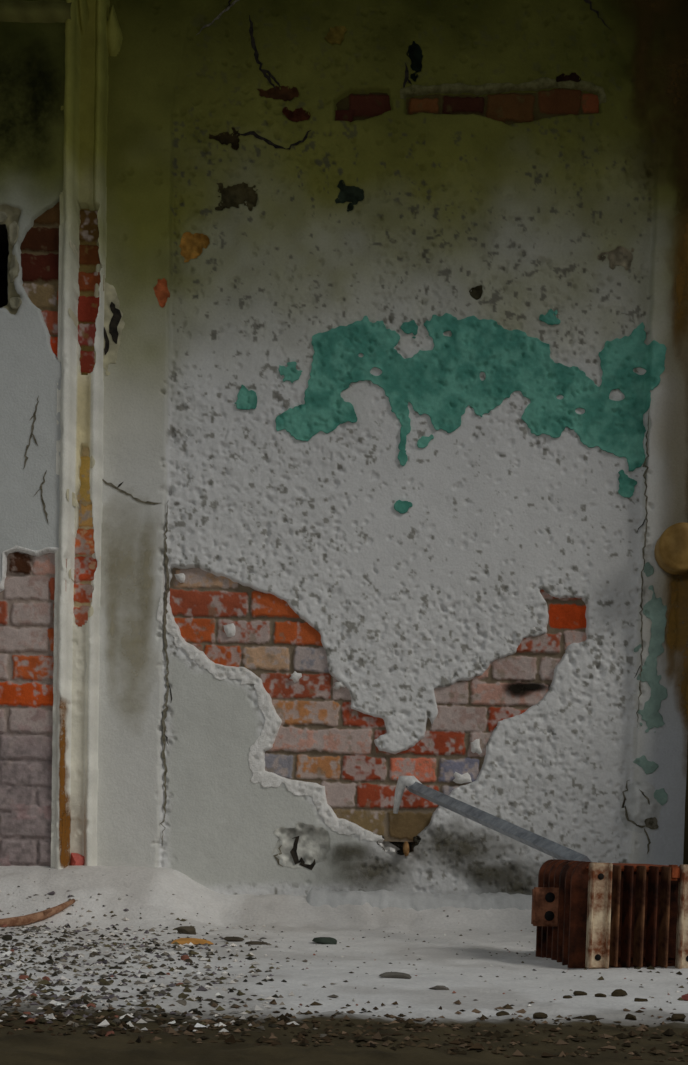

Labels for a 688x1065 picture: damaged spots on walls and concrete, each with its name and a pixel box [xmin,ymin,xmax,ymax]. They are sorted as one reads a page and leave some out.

spalling [335,41,607,125]
spalling [0,201,125,375]
spalling [469,285,483,300]
peeling [539,309,561,325]
crack [23,396,48,523]
peeling [235,385,257,410]
peeling [394,500,413,514]
peeling [275,313,667,498]
spalling [0,447,101,866]
spalling [156,567,587,870]